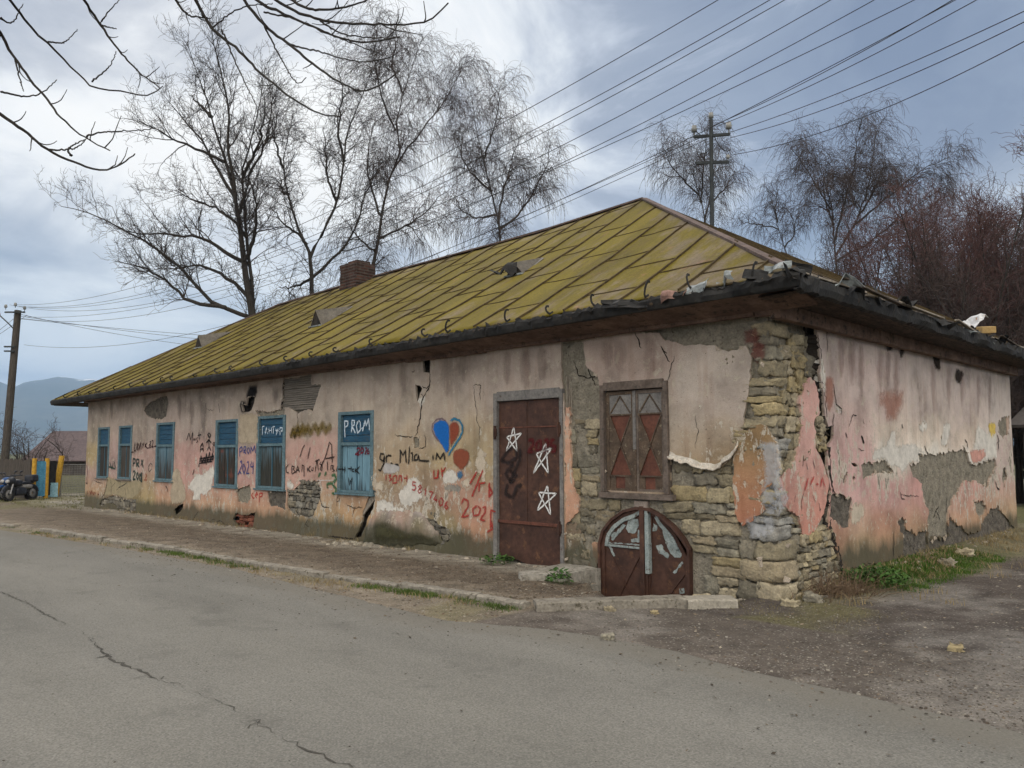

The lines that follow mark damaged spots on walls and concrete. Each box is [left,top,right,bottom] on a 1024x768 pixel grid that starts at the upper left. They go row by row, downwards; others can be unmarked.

flaking render [143,396,168,421]
flaking render [237,374,321,444]
crack [396,370,430,449]
flaking render [562,316,1012,601]
crack [794,327,865,570]
flaking render [235,485,255,527]
flaking render [268,479,321,519]